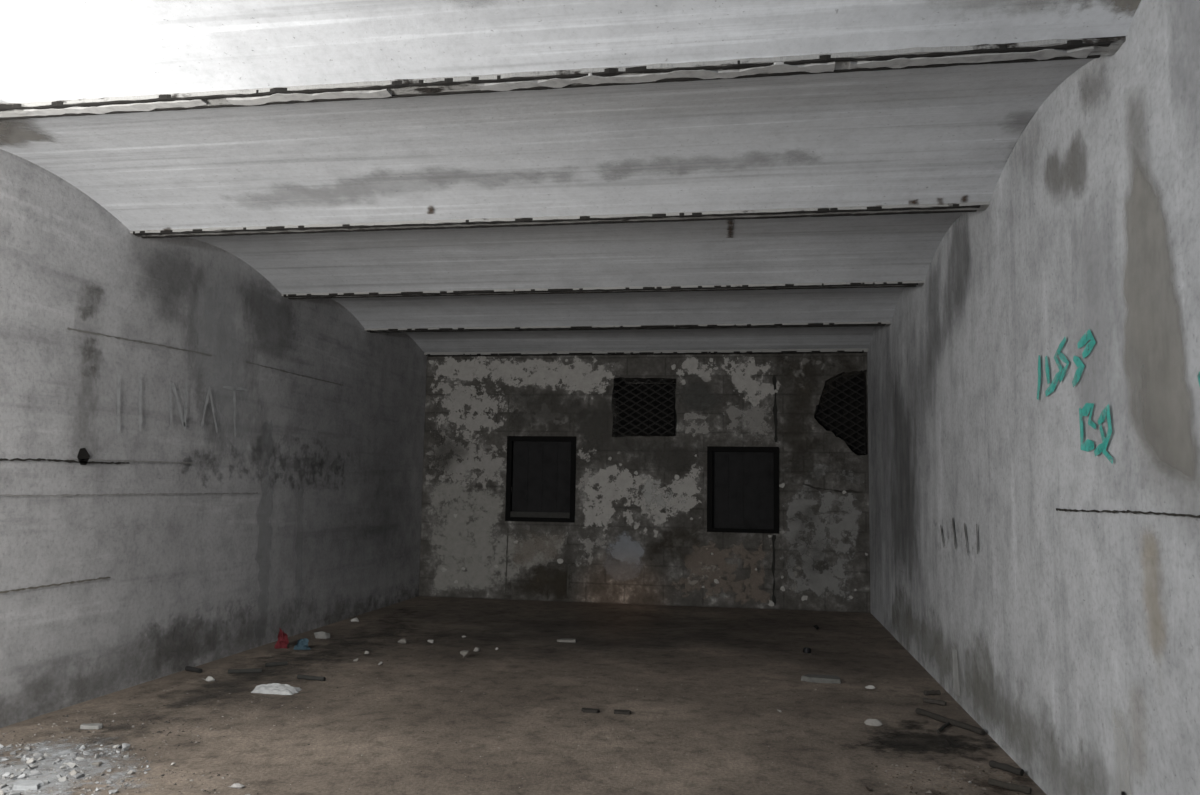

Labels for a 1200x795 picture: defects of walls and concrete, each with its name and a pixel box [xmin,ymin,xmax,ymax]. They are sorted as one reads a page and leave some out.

damp [1107,0,1141,12]
damp [1047,141,1084,189]
damp [1124,166,1195,480]
peeling [684,412,710,437]
peeling [671,356,781,407]
spalling [814,372,866,455]
peeling [426,355,703,592]
peeling [672,464,868,606]